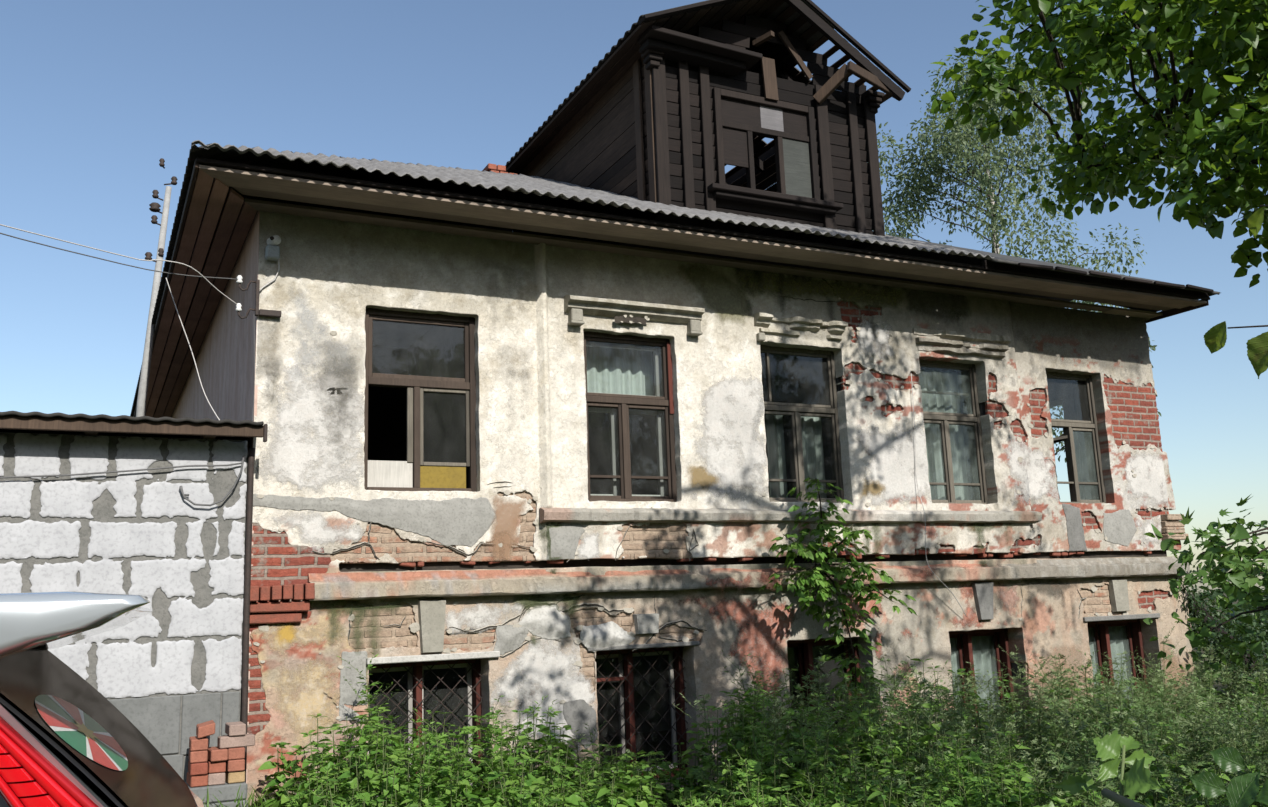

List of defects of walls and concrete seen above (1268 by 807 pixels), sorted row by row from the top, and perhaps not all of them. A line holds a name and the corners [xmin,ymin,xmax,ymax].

peeling [256,304,364,501]
peeling [692,377,767,501]
peeling [836,298,931,507]
peeling [985,373,1059,505]
spalling [1103,374,1169,554]
spalling [247,490,564,741]
peeling [443,601,635,753]
peeling [578,534,599,559]
spalling [616,523,716,567]
peeling [679,557,795,697]
spalling [821,536,890,559]
spalling [909,525,1084,568]